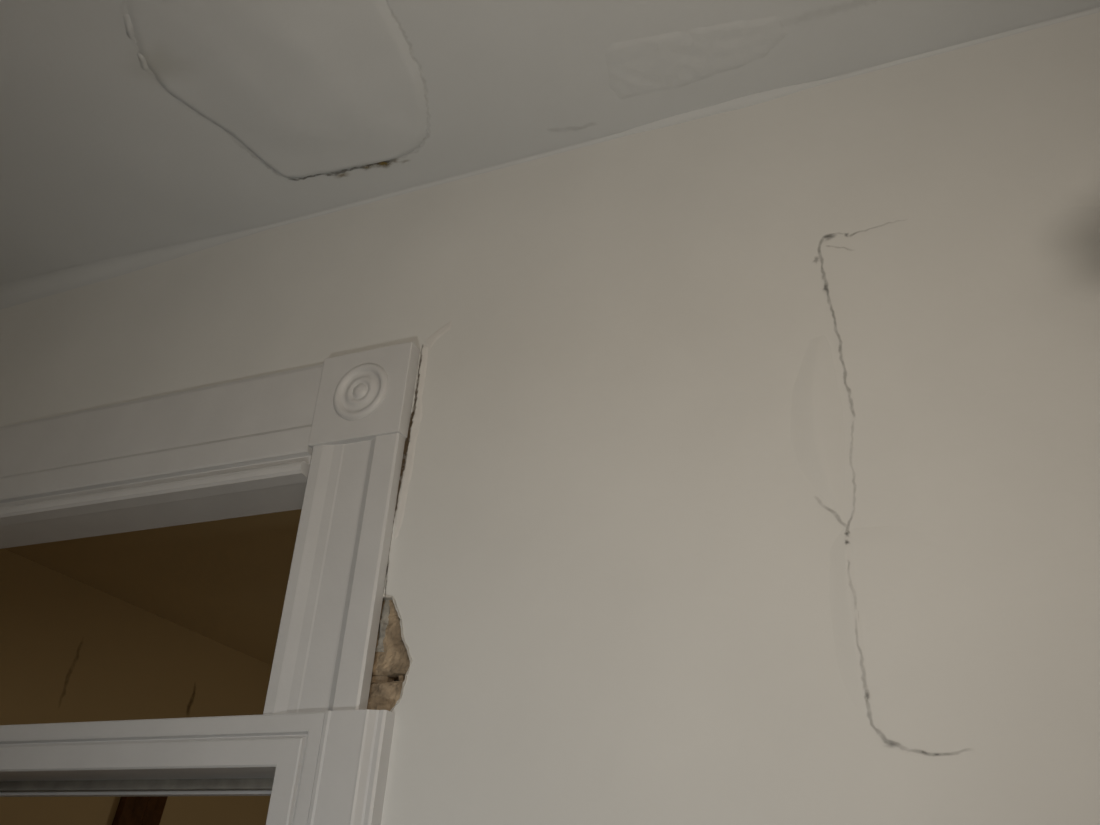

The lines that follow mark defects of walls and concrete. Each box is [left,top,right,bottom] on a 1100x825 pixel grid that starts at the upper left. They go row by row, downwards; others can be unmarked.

crack [292,161,389,180]
spalling [367,594,413,712]